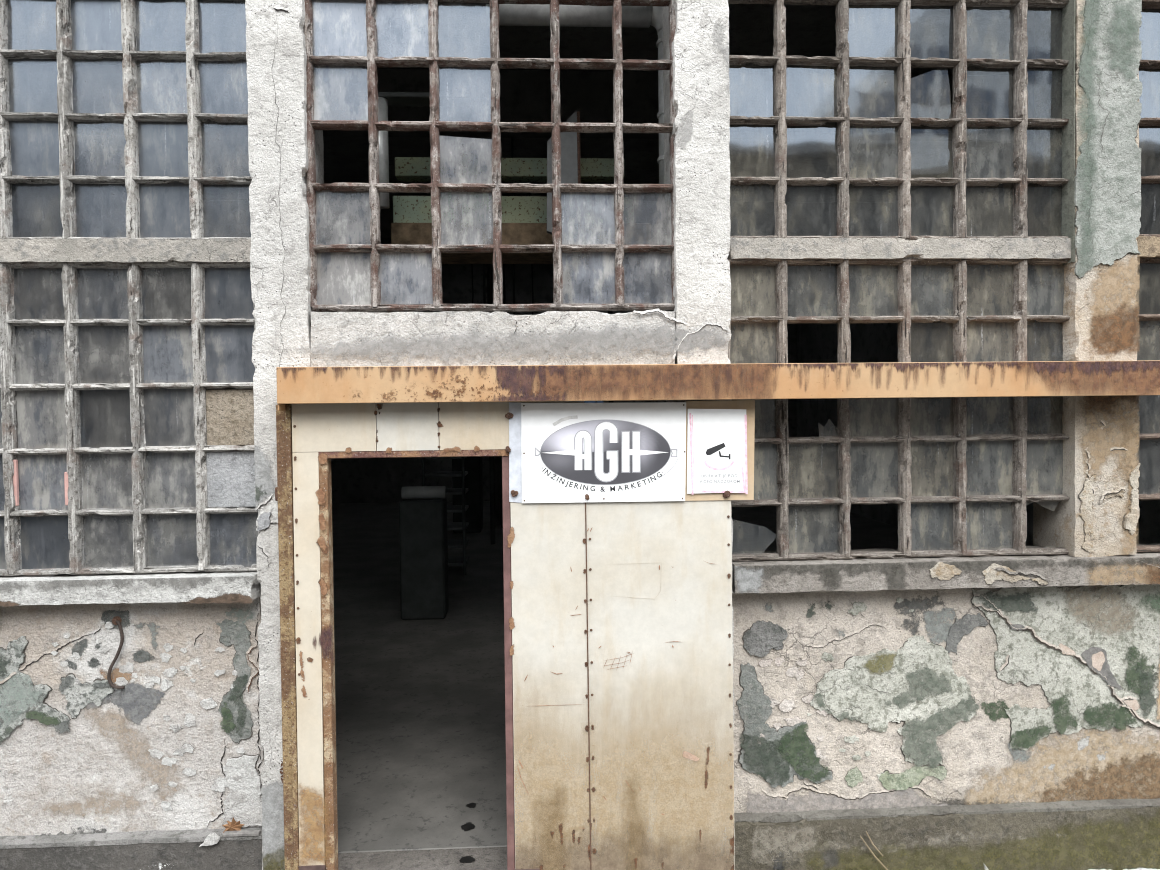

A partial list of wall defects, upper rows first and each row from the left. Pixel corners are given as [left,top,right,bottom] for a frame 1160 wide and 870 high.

crack [272,6,290,367]
leakage [1078,0,1100,272]
rust [282,257,1160,514]
crack [0,624,101,685]
peeling [0,593,254,811]
crack [205,599,283,828]
rust [295,625,333,700]
rust [315,489,328,554]
peeling [736,562,1160,813]
crack [974,594,1160,729]
spalling [1078,463,1140,553]
rust [1089,529,1160,584]